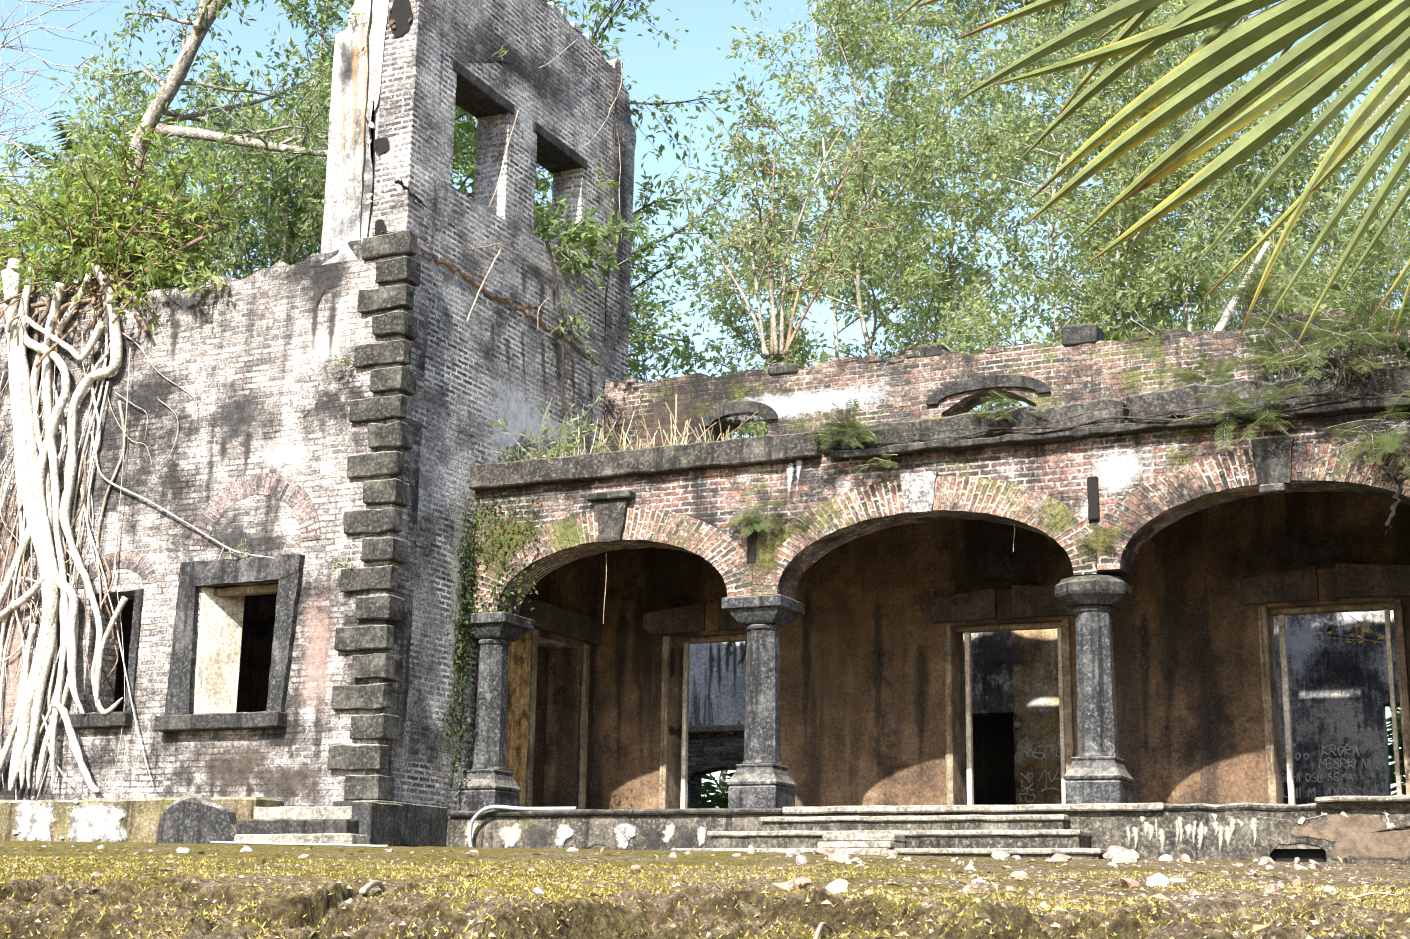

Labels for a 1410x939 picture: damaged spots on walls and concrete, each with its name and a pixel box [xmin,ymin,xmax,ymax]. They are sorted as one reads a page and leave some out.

crack [357,0,427,240]
damp [514,259,556,317]
damp [130,365,163,455]
damp [215,386,305,470]
damp [218,526,281,558]
damp [615,594,645,753]
damp [802,592,811,732]
damp [915,648,927,753]
damp [1140,589,1176,747]
damp [1307,640,1374,692]
flaking render [12,796,127,842]
flaking render [1241,810,1410,860]